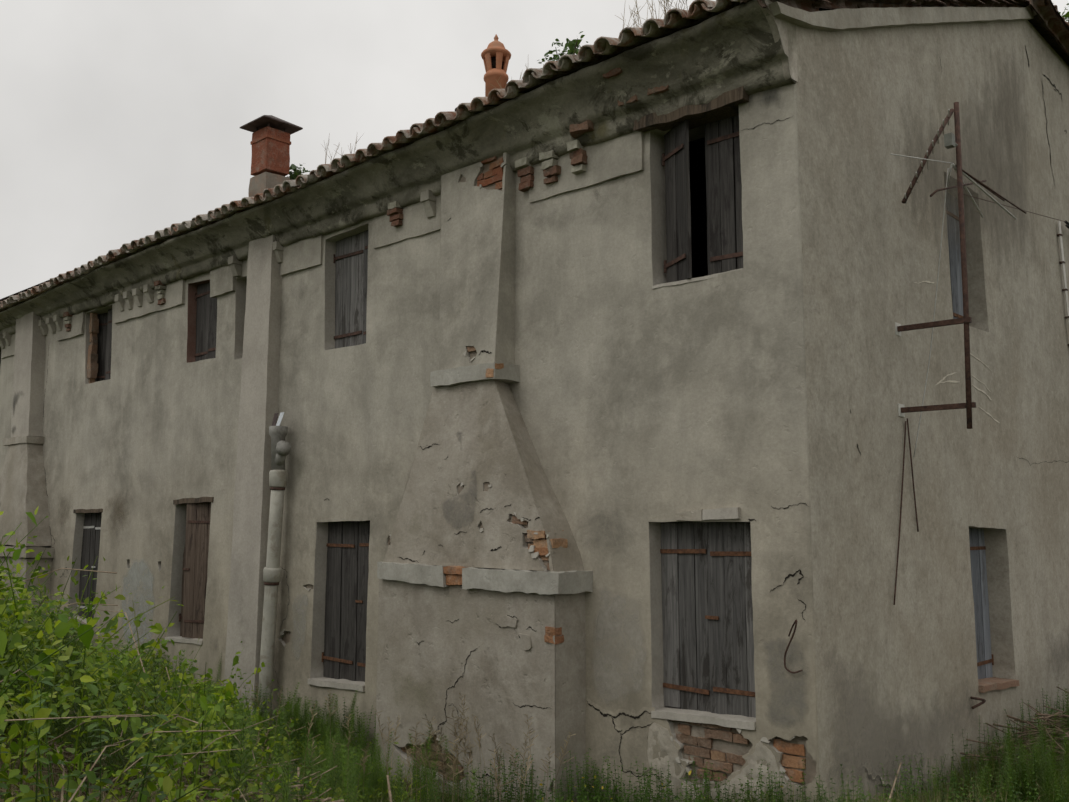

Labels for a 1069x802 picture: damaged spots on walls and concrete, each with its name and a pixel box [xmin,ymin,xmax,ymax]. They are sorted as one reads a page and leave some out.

crack [1025,45,1067,188]
spalling [459,156,507,191]
spalling [509,512,568,571]
crack [769,570,806,620]
crack [438,648,477,738]
crack [586,698,663,787]
spalling [647,720,817,802]